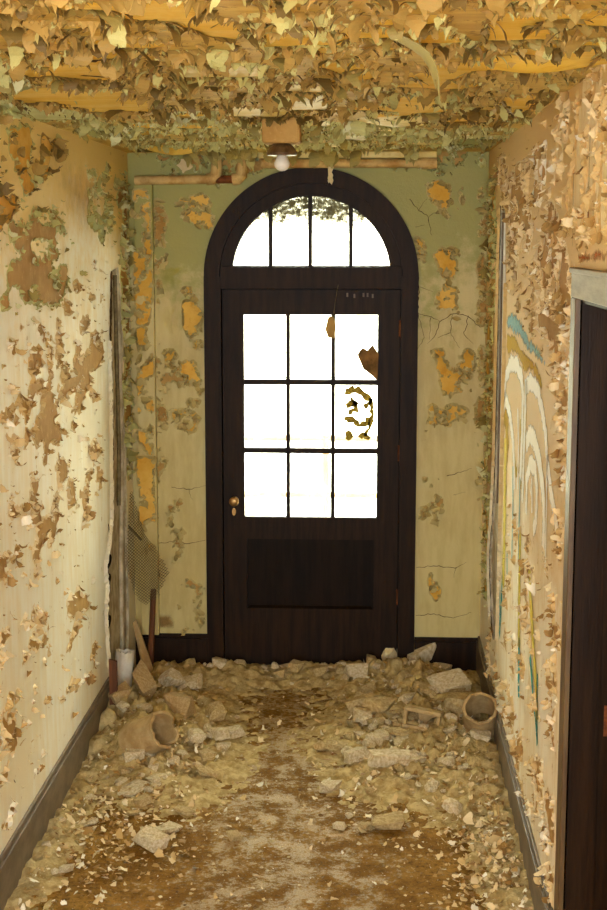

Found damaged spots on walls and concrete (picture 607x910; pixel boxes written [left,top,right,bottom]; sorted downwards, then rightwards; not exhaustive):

peeling [0,0,607,683]
crack [416,284,498,638]
peeling [0,688,39,789]
peeling [44,581,101,705]
spalling [108,660,186,705]
peeling [483,642,555,856]
peeling [532,582,562,753]
peeling [1,796,19,833]
peeling [533,861,554,907]